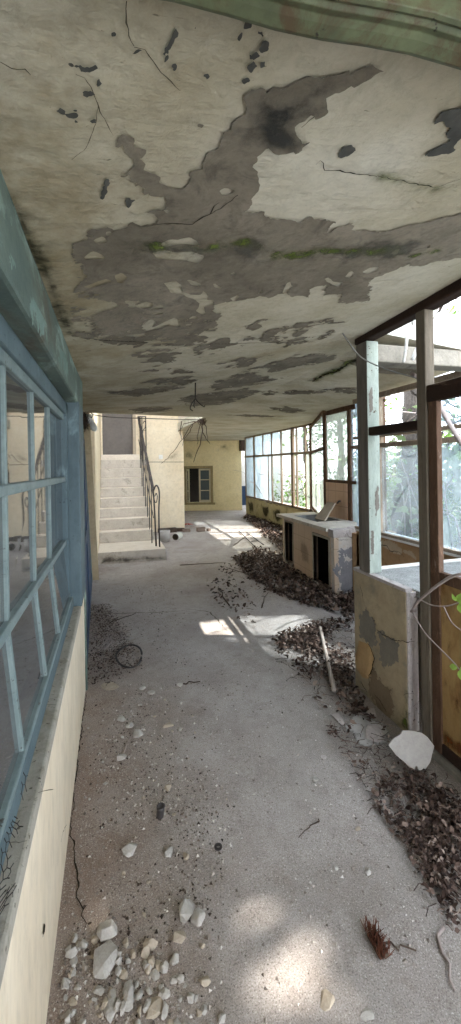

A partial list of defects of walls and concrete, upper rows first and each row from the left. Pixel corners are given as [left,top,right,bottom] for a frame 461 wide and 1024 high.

crack [125,1,179,90]
peeling [62,57,102,97]
peeling [57,108,96,123]
leakage [259,103,302,149]
crack [320,160,457,187]
crack [138,195,238,227]
spalling [70,22,461,417]
leakage [18,213,56,290]
leakage [339,241,418,258]
peeling [333,547,353,594]
spalling [359,608,400,718]
crack [38,695,87,930]